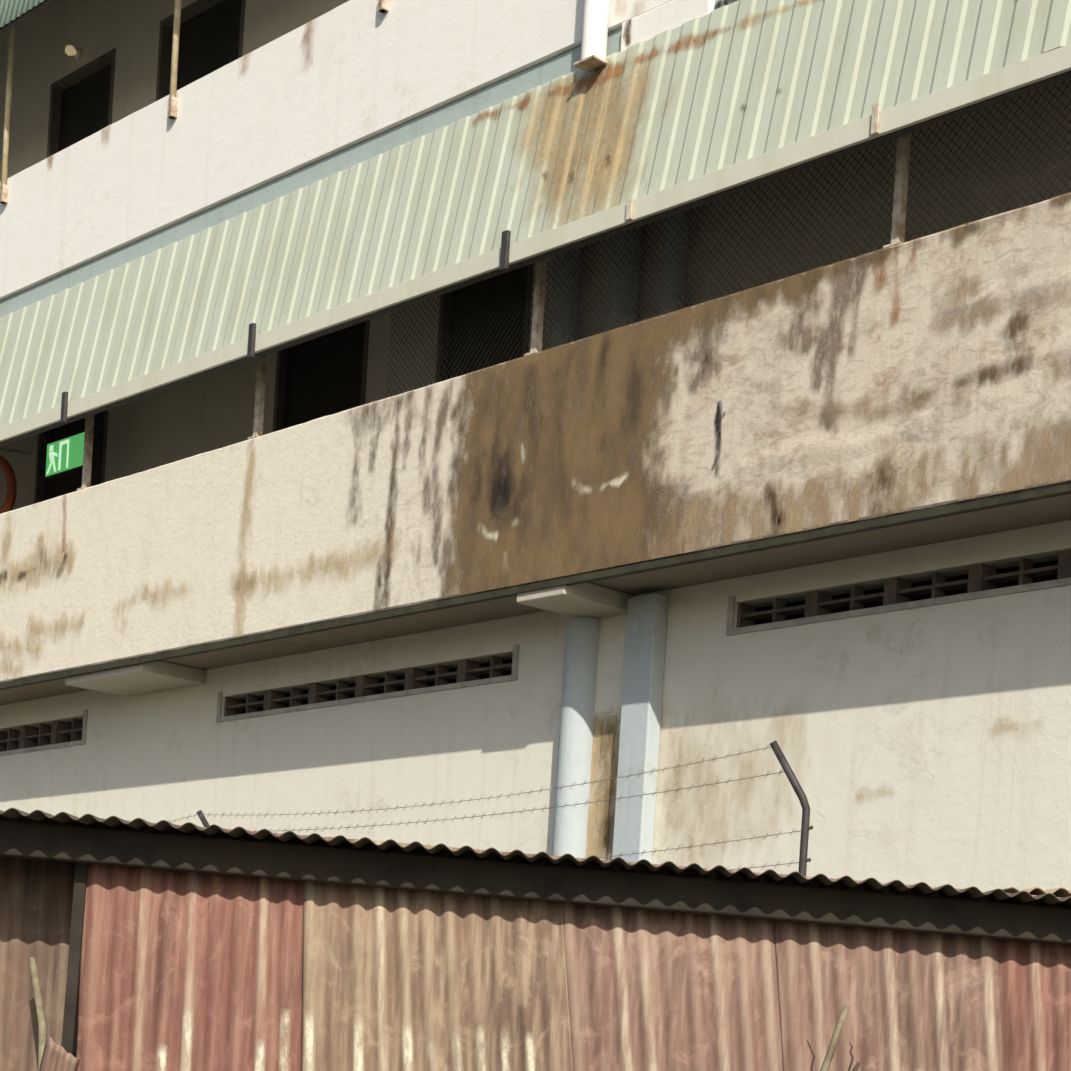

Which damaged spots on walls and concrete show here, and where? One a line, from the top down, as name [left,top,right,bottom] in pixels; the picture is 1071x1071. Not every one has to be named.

rust [519,30,717,220]
water stain [951,221,976,243]
water stain [1051,192,1071,205]
water stain [355,401,380,469]
water stain [420,246,891,599]
water stain [0,533,73,584]
water stain [243,451,254,535]
water stain [366,424,410,610]
water stain [844,453,939,522]
water stain [586,715,620,860]